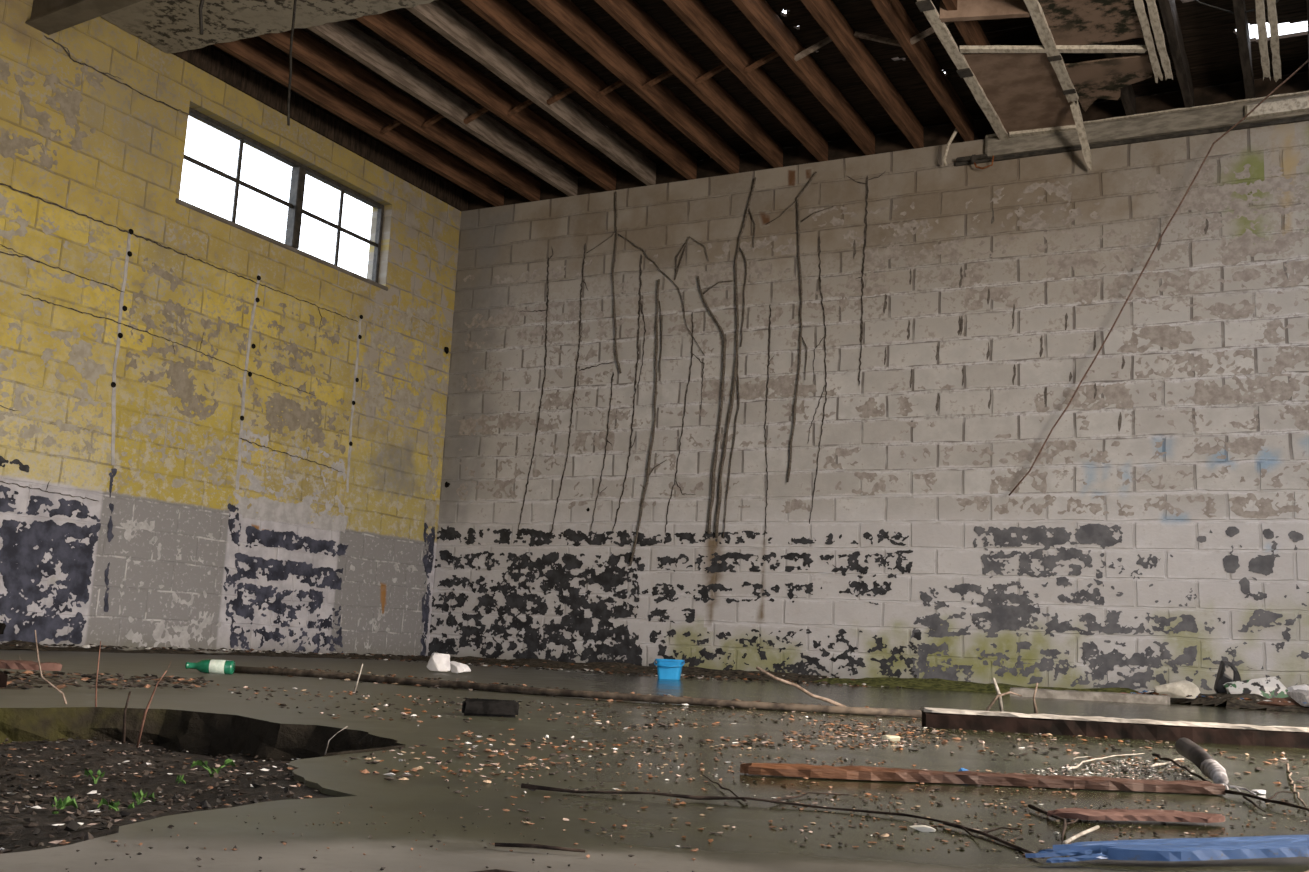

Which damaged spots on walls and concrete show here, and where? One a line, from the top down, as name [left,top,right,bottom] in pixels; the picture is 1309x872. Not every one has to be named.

peeling [0,158,1309,691]
water stain [358,135,1279,539]
water stain [1295,121,1309,246]